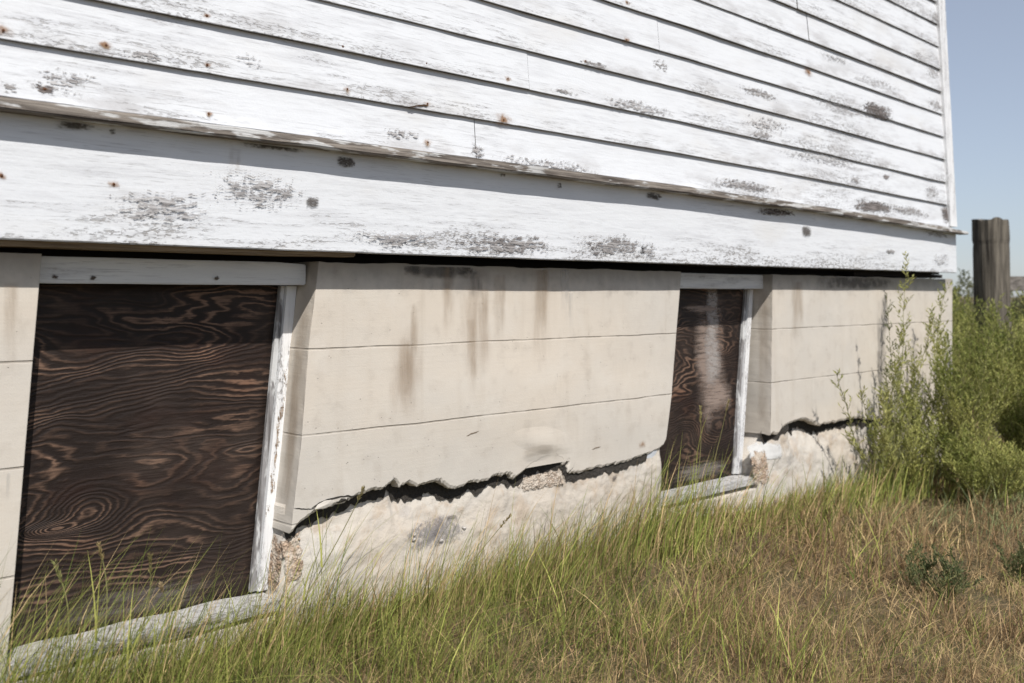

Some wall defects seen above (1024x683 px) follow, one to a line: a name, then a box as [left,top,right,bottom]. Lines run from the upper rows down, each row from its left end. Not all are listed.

peeling [805,93,893,124]
peeling [109,166,318,226]
peeling [714,178,779,194]
peeling [853,199,929,218]
peeling [348,229,553,257]
peeling [574,234,657,258]
crack [760,418,893,445]
crack [284,446,648,541]
spalling [518,471,565,492]
spalling [268,531,304,591]